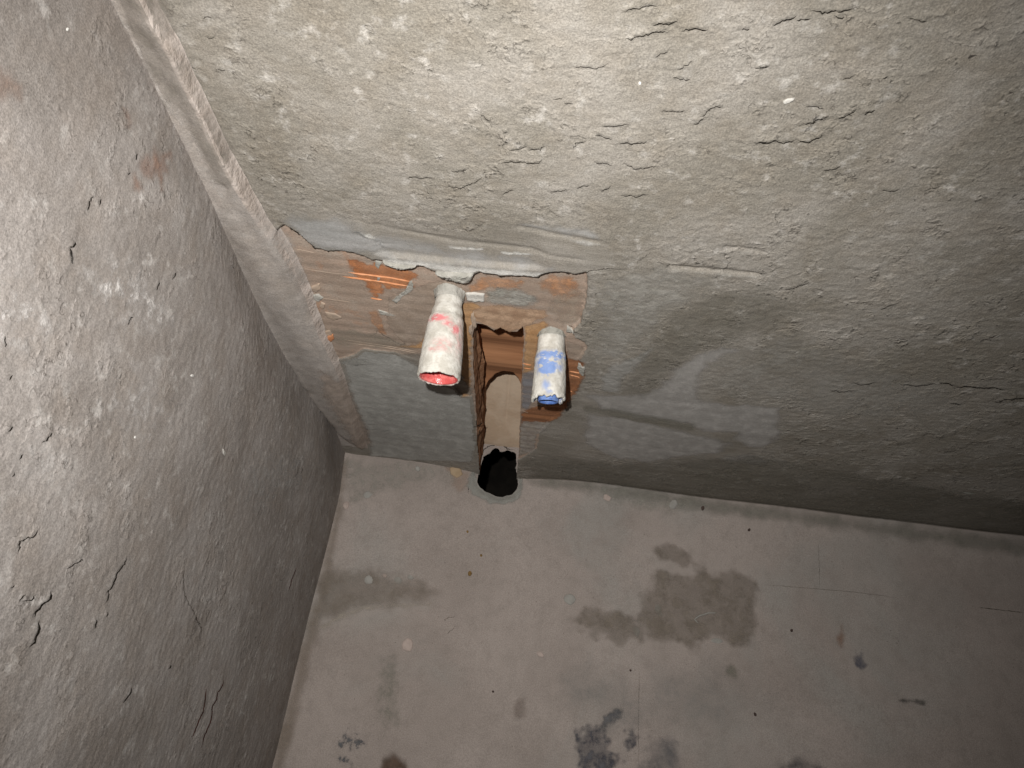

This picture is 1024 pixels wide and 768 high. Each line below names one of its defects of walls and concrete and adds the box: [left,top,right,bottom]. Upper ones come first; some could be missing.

crack [626,5,706,81]
crack [774,8,854,26]
crack [550,124,656,198]
crack [755,106,875,145]
flaking render [135,0,588,460]
crack [11,586,52,646]
leakage [579,571,756,644]
leakage [576,709,621,768]